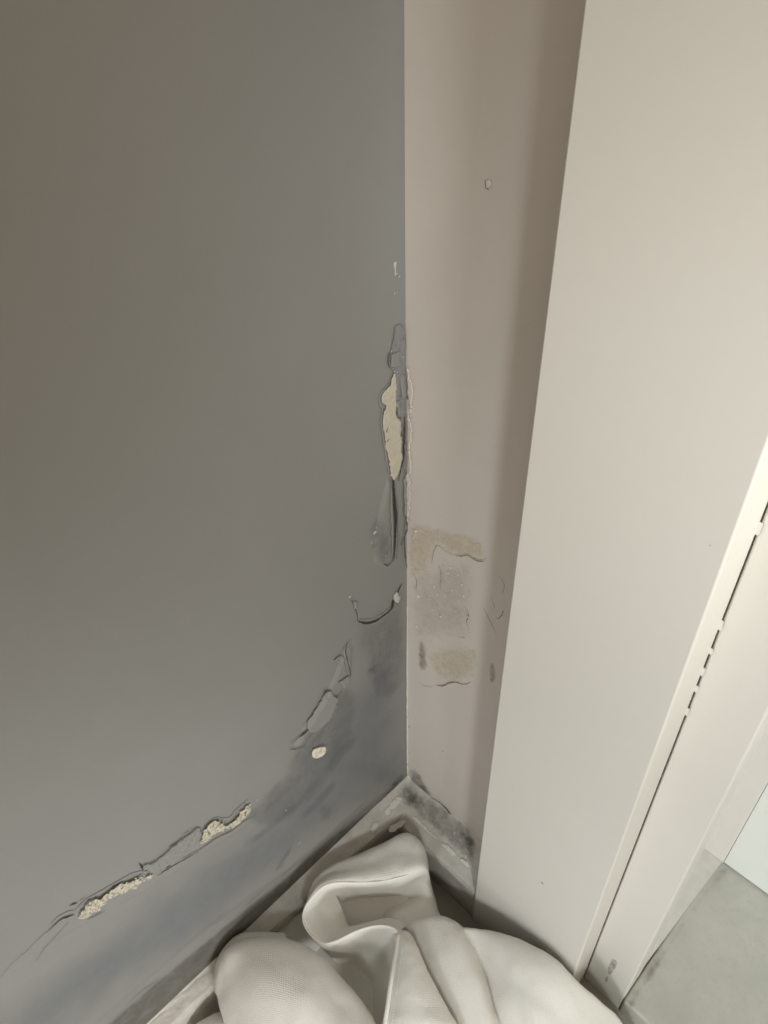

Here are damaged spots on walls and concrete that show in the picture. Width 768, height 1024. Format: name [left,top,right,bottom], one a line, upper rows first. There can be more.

flaking render [378,324,417,538]
peeling [311,744,326,759]
peeling [307,691,338,733]
peeling [402,652,410,776]
peeling [74,801,252,919]